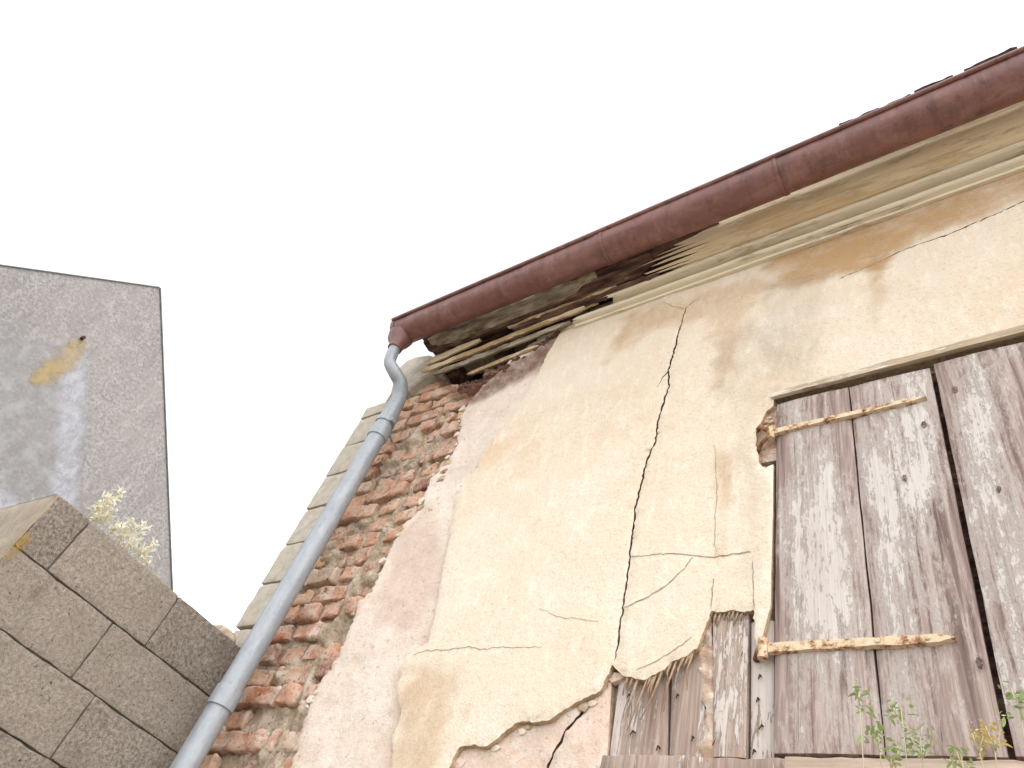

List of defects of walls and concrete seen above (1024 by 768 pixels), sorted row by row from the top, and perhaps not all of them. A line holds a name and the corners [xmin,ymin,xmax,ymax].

leakage [775,191,976,285]
crack [842,201,1024,278]
crack [543,302,754,670]
peeling [200,314,578,768]
crack [547,686,608,768]